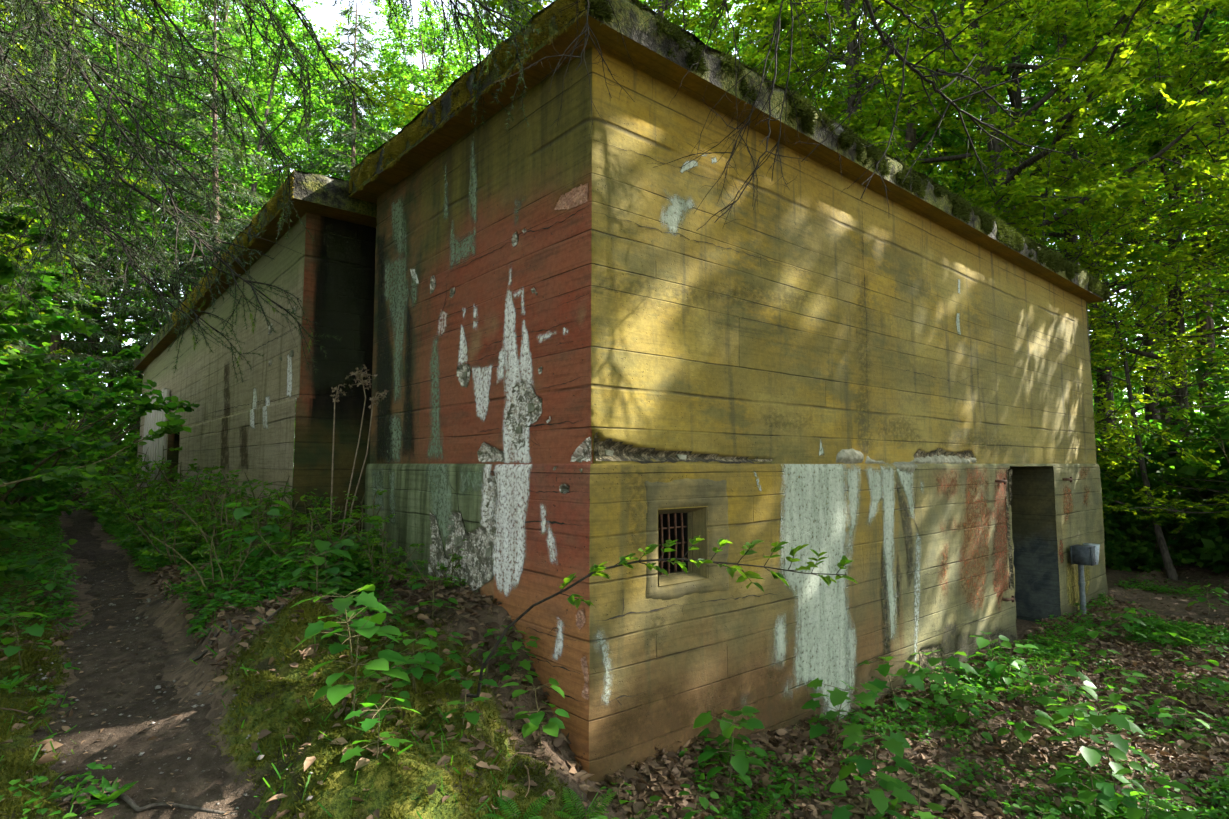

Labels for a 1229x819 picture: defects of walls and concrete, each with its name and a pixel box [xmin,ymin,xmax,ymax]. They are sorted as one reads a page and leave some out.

damp [444,140,477,267]
damp [309,199,568,595]
spalling [427,363,551,591]
spalling [553,433,773,473]
corrosion [936,469,1009,608]
damp [554,622,563,659]